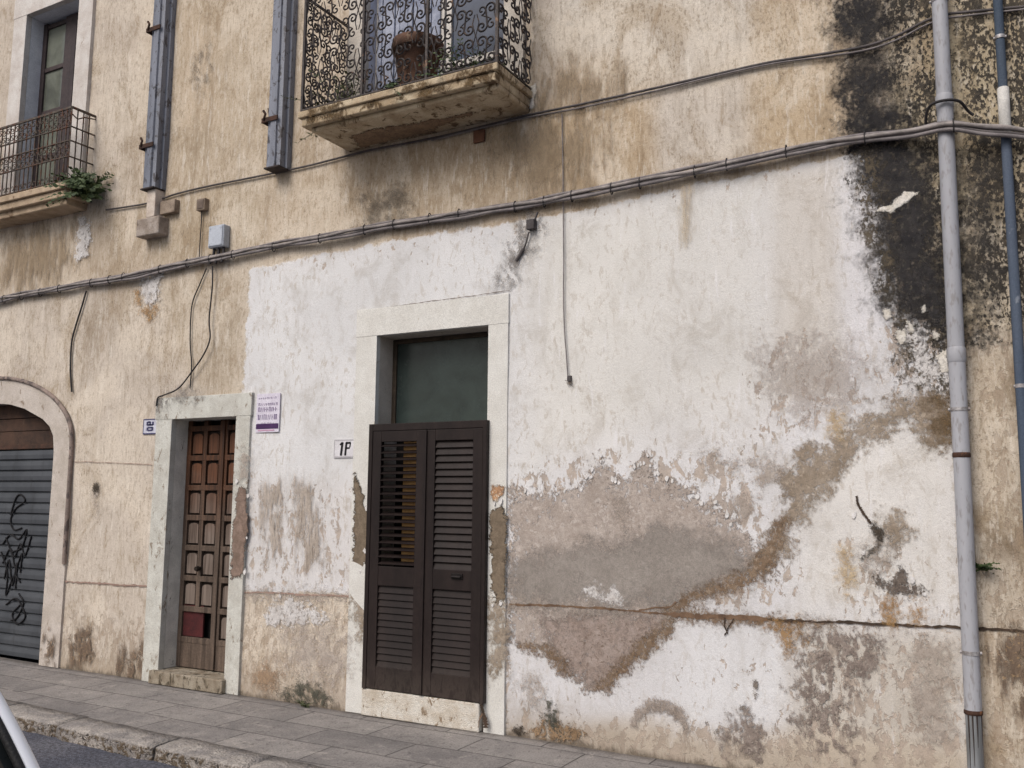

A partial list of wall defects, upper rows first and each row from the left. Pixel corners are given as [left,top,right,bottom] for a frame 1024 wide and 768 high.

peeling [74,214,93,262]
water stain [355,189,408,228]
water stain [949,0,1024,358]
water stain [672,0,952,611]
flaking render [230,453,250,580]
flaking render [352,472,367,574]
peeling [486,449,788,696]
crack [508,596,1024,636]